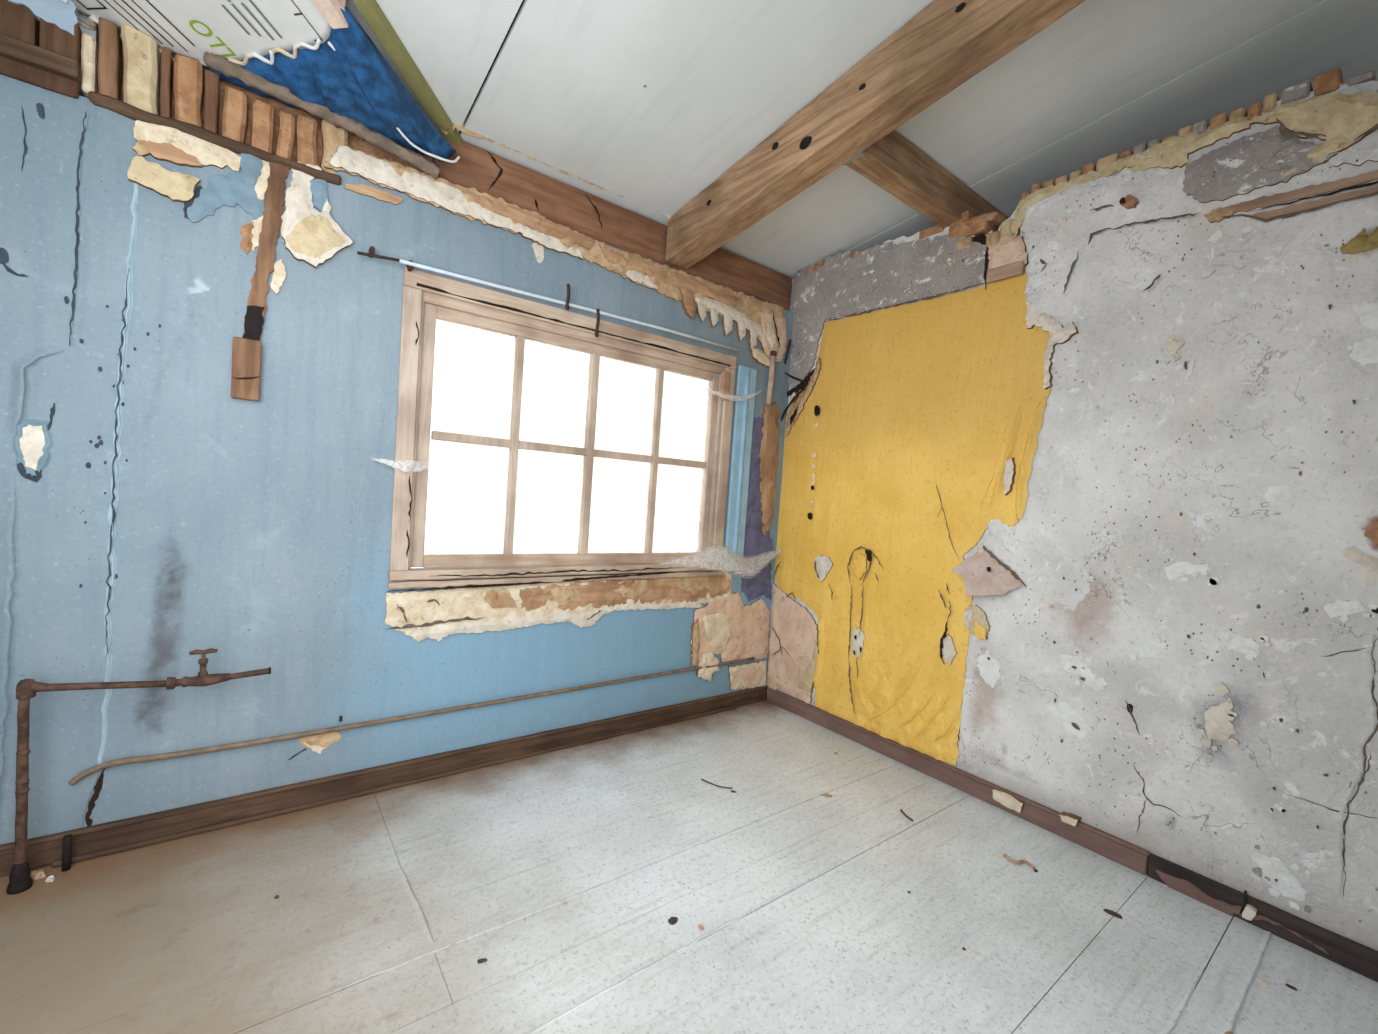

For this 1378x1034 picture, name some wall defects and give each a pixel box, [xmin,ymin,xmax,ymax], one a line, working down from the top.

flaking render [127,120,270,254]
flaking render [270,146,784,350]
flaking render [988,235,1029,269]
flaking render [1021,68,1378,200]
peeling [12,403,55,482]
flaking render [384,561,819,704]
crack [1289,634,1378,897]